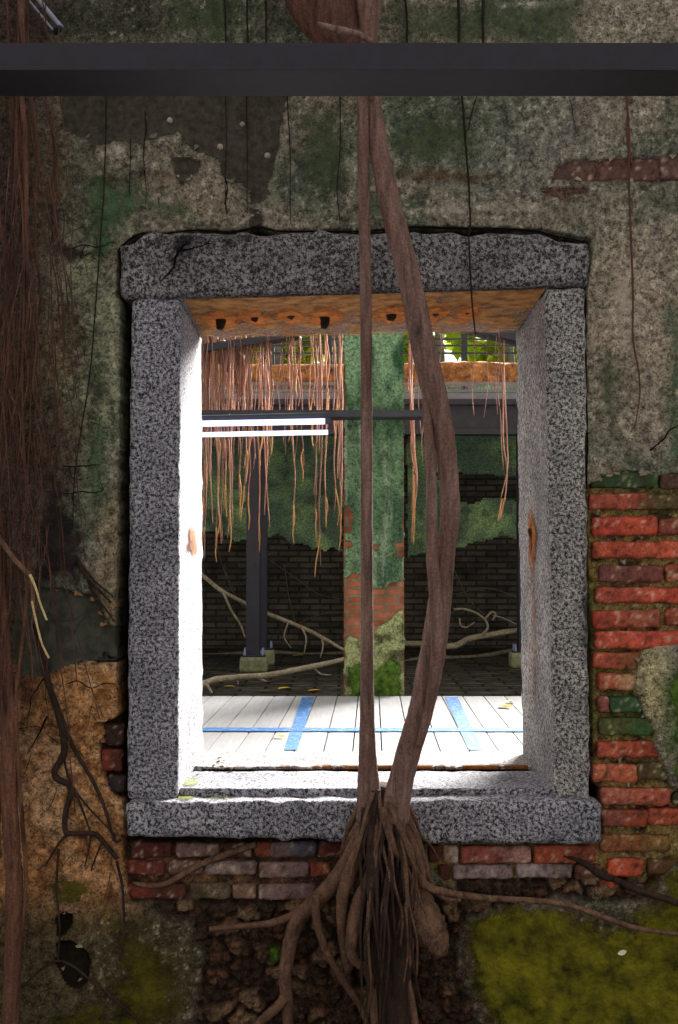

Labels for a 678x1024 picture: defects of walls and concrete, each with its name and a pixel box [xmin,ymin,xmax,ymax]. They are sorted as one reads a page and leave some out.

flaking render [548,154,678,200]
crack [69,181,588,282]
flaking render [455,436,516,476]
rust [188,527,198,555]
rust [527,512,536,572]
flaking render [428,469,678,889]
flaking render [99,718,128,792]